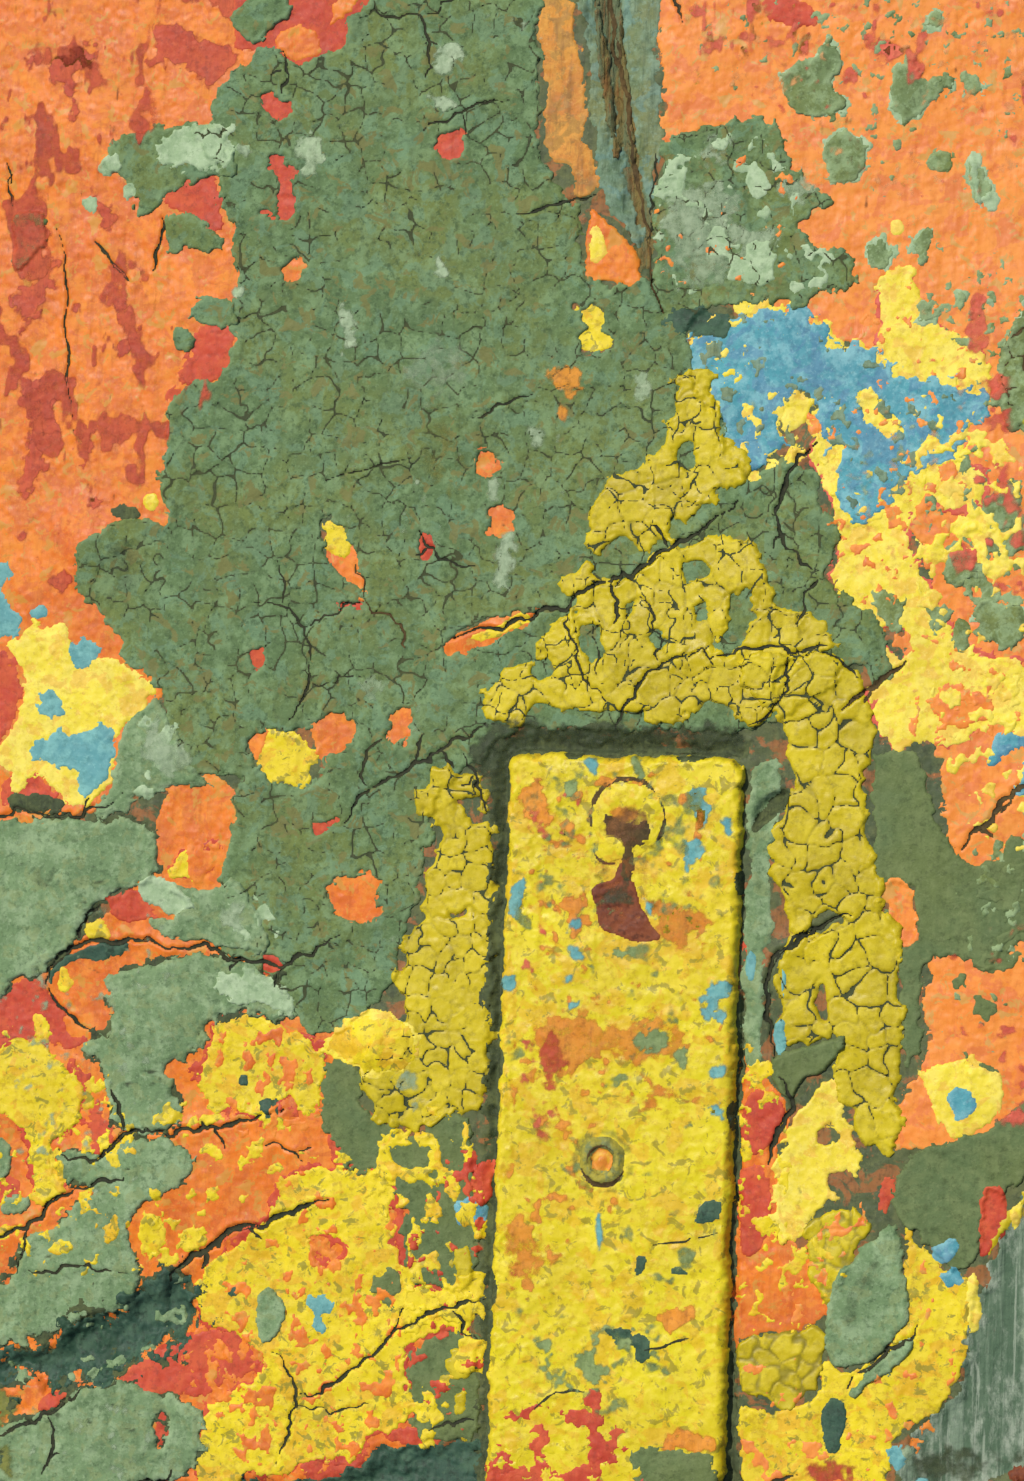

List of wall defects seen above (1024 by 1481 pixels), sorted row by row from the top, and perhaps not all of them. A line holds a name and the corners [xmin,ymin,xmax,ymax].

crack [45,0,906,1165]
peeling [634,787,732,872]
peeling [612,944,658,991]
peeling [695,981,733,1030]
peeling [709,1065,726,1079]
peeling [726,1101,737,1131]
crack [0,1089,311,1274]
crack [169,1199,329,1282]
peeling [634,1247,695,1284]
crack [271,1298,486,1464]
crack [0,1388,81,1474]
crack [139,1469,172,1481]